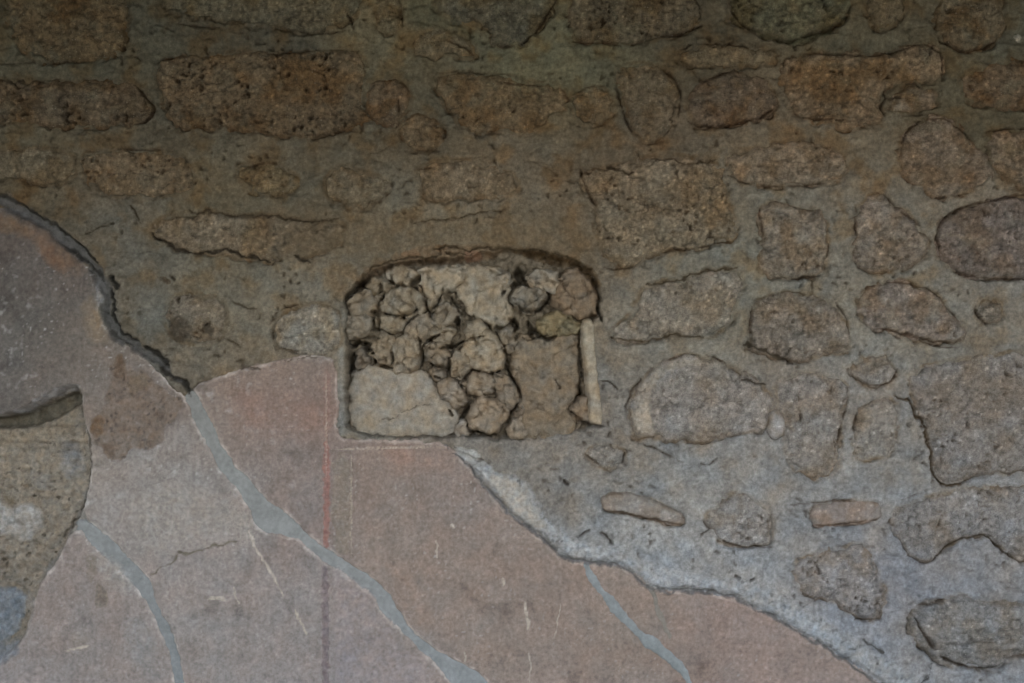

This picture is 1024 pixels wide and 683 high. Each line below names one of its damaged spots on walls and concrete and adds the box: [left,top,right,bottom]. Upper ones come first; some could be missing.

spalling [355,242,504,290]
spalling [167,314,215,344]
spalling [0,353,183,642]